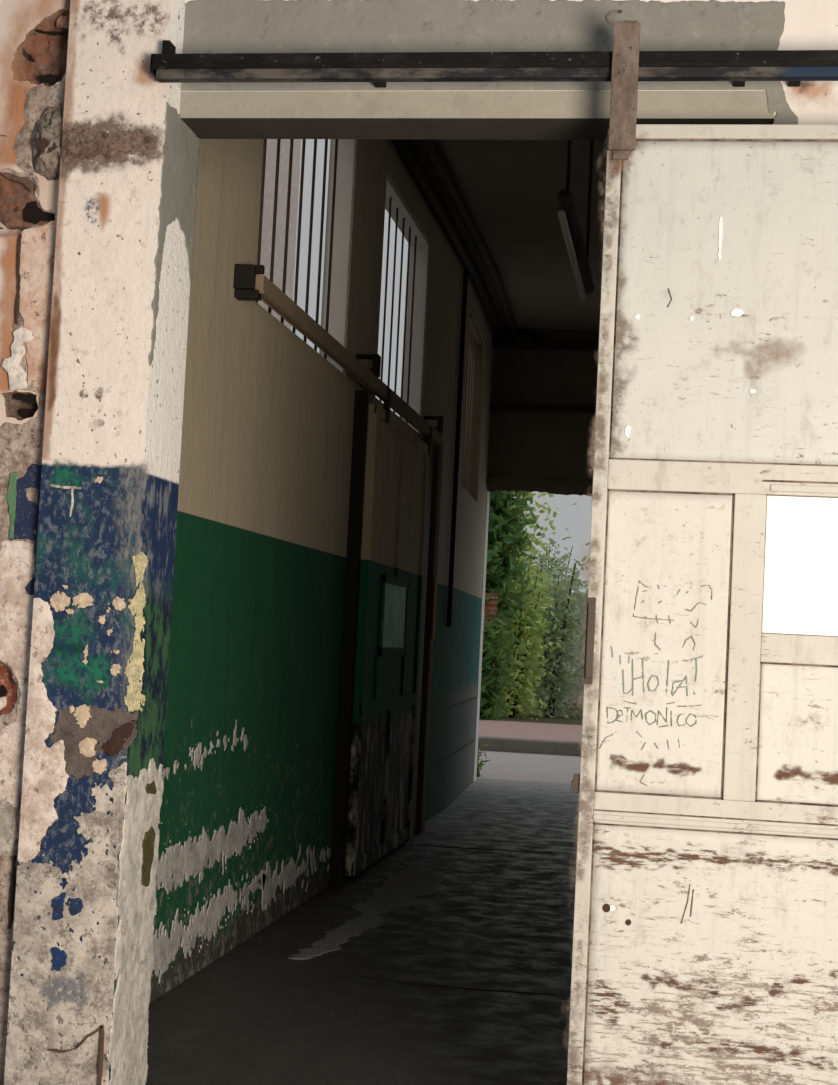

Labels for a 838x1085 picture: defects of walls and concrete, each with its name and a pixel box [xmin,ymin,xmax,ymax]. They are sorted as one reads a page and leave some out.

peeling [0,9,331,1085]